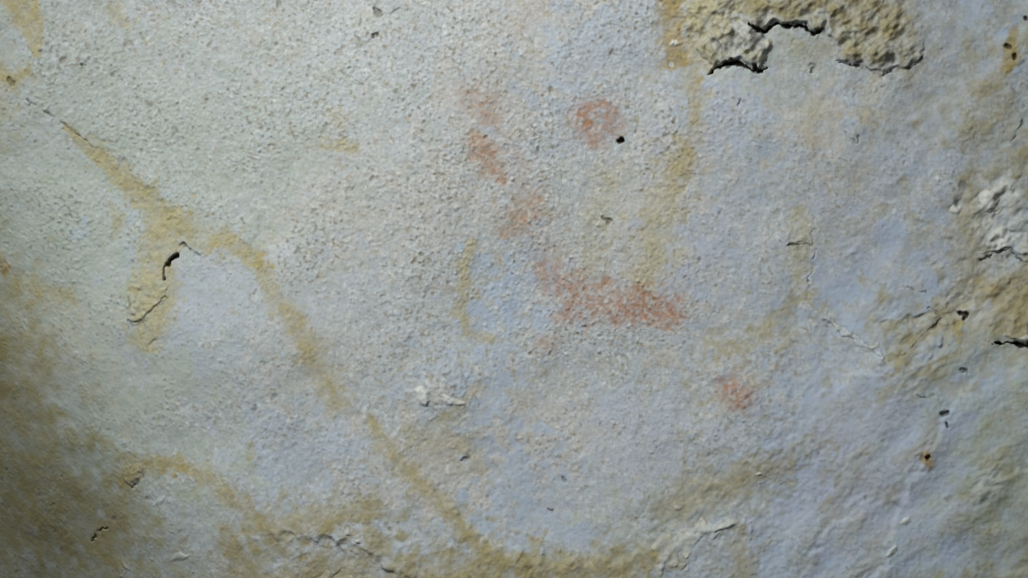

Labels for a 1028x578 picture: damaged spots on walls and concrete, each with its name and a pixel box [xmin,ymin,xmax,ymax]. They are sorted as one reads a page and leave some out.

damp [309,91,363,161]
peeling [979,189,999,210]
crack [162,241,207,281]
spalling [981,221,1028,342]
damp [57,121,800,578]
crack [313,538,403,578]
crack [515,548,527,565]